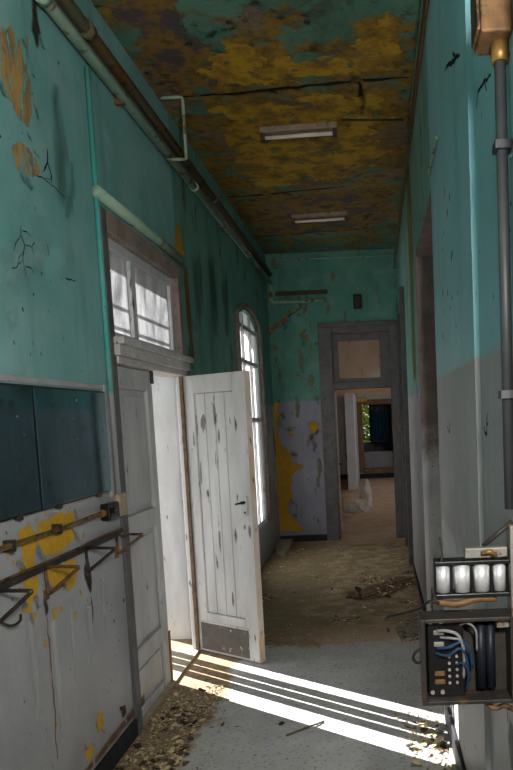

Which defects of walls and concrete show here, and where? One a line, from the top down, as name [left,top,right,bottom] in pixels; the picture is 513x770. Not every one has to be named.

peeling [0,0,45,189]
peeling [93,0,407,101]
crack [182,77,409,98]
peeling [202,92,400,196]
peeling [173,222,195,358]
peeling [273,399,304,532]
peeling [7,506,85,624]